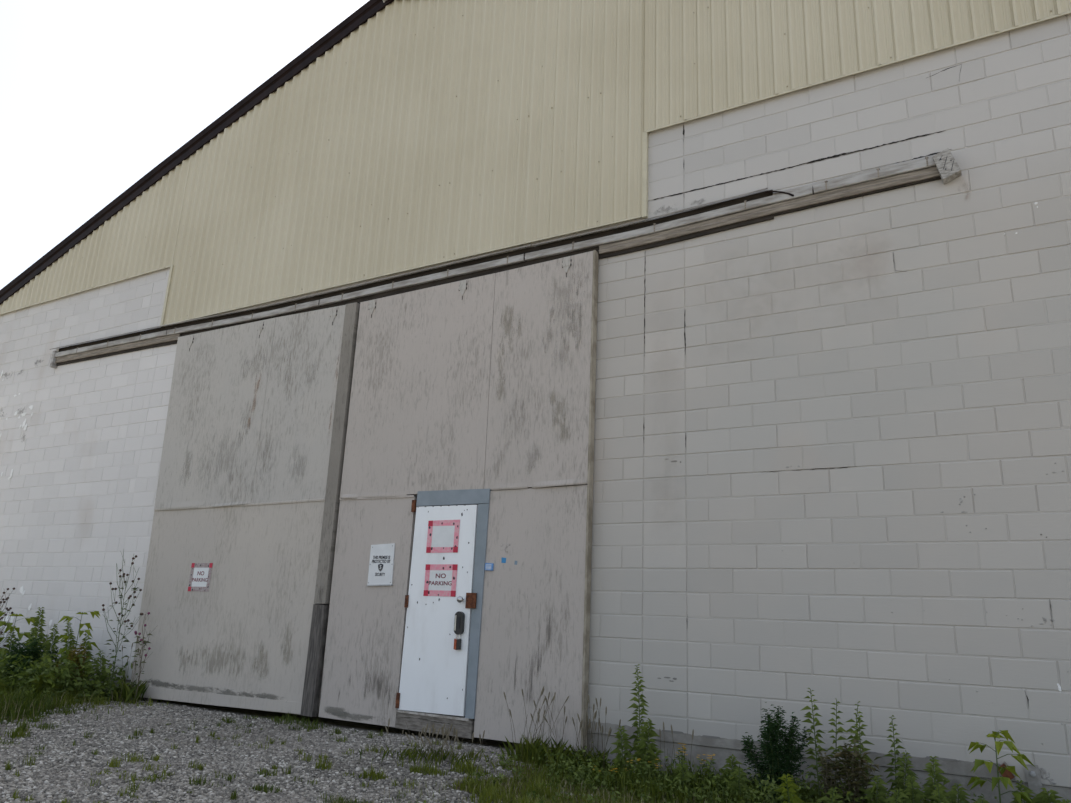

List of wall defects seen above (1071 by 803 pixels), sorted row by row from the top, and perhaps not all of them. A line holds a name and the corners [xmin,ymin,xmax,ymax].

crack [649,130,951,201]